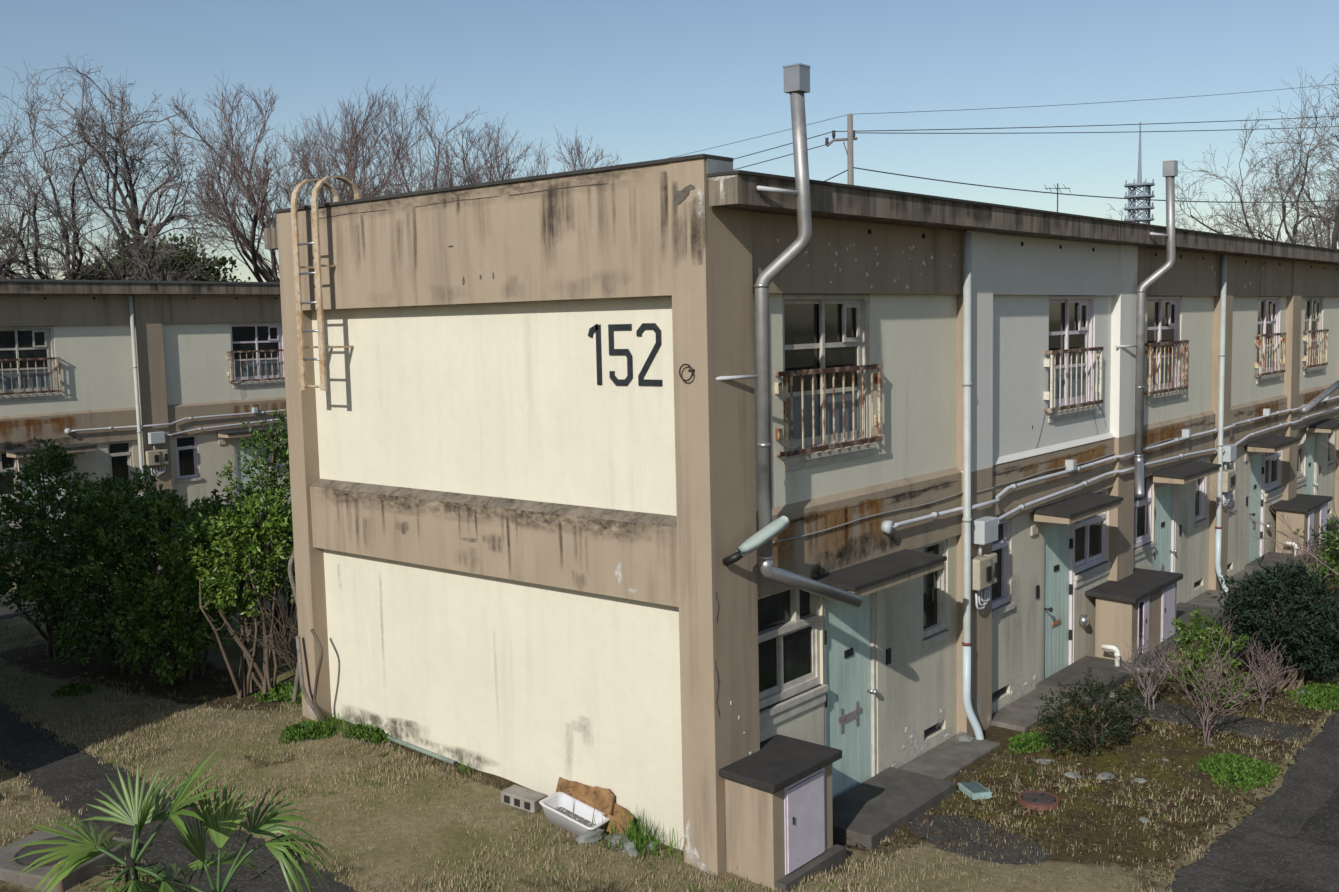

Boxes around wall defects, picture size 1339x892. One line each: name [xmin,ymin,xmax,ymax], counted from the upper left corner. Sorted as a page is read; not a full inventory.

leakage [691,189,705,247]
corrosion [2,418,72,436]
leakage [493,508,562,550]
corrosion [772,521,794,563]
corrosion [809,499,882,545]
leakage [347,715,412,739]